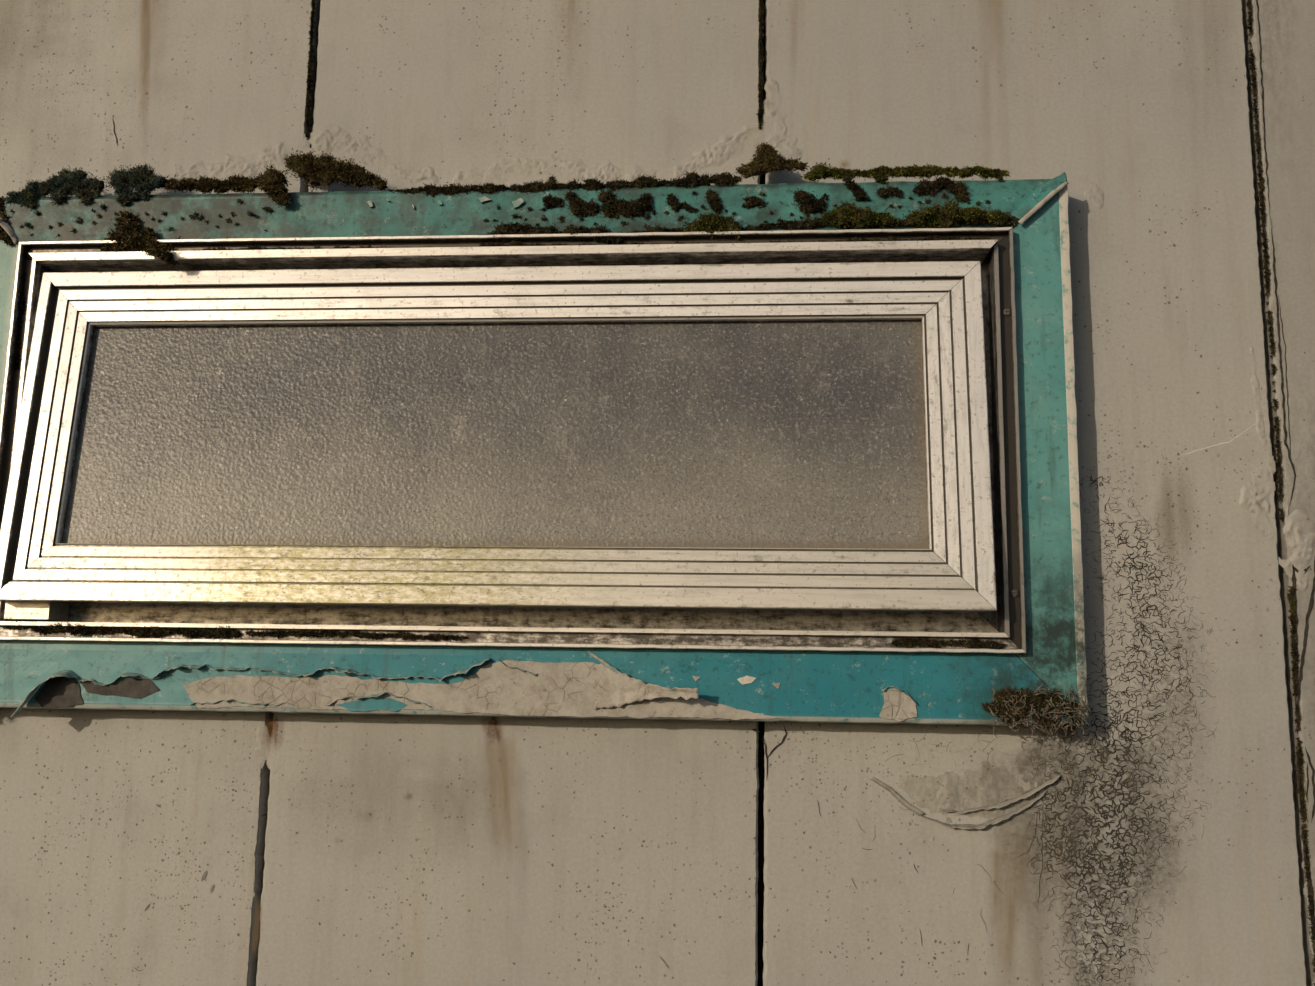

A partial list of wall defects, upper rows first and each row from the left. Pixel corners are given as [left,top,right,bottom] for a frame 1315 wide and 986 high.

peeling [11,650,778,720]
peeling [879,686,918,722]
peeling [871,761,1061,829]